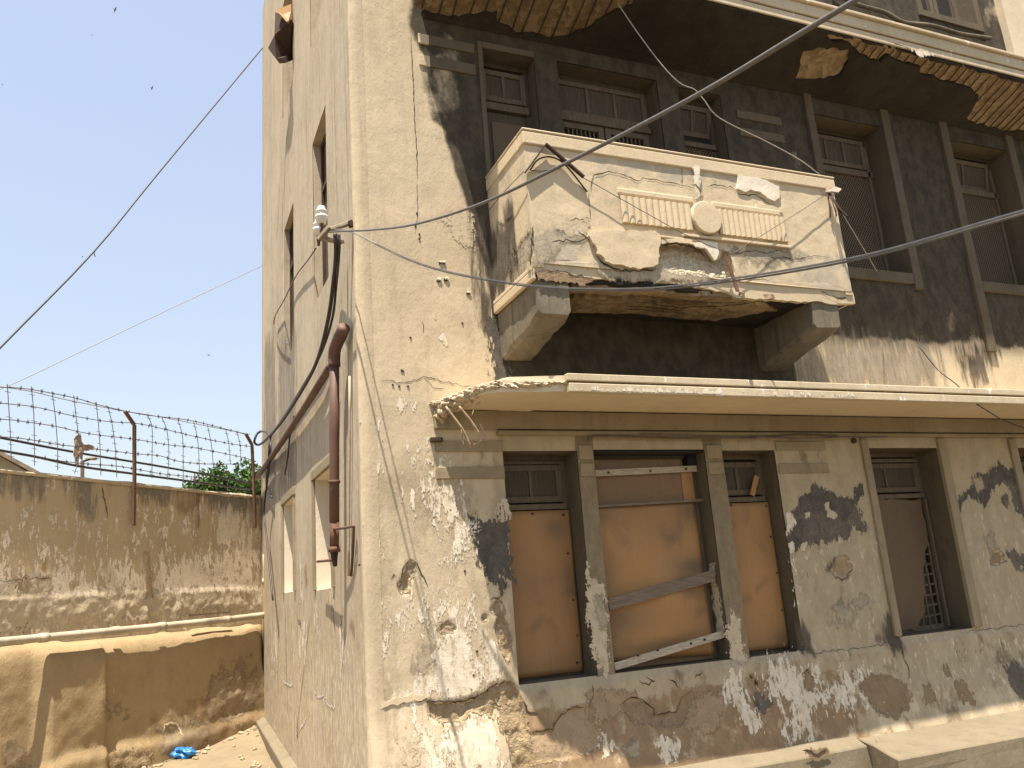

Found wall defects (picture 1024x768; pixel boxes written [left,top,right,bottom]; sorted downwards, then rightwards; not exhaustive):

spalling [415,0,633,39]
spalling [796,35,1024,132]
crack [410,47,418,233]
crack [510,168,692,284]
peeling [532,218,708,286]
spalling [660,238,719,261]
spalling [392,380,721,448]
peeling [757,390,854,398]
spalling [0,475,318,731]
spalling [380,436,914,768]